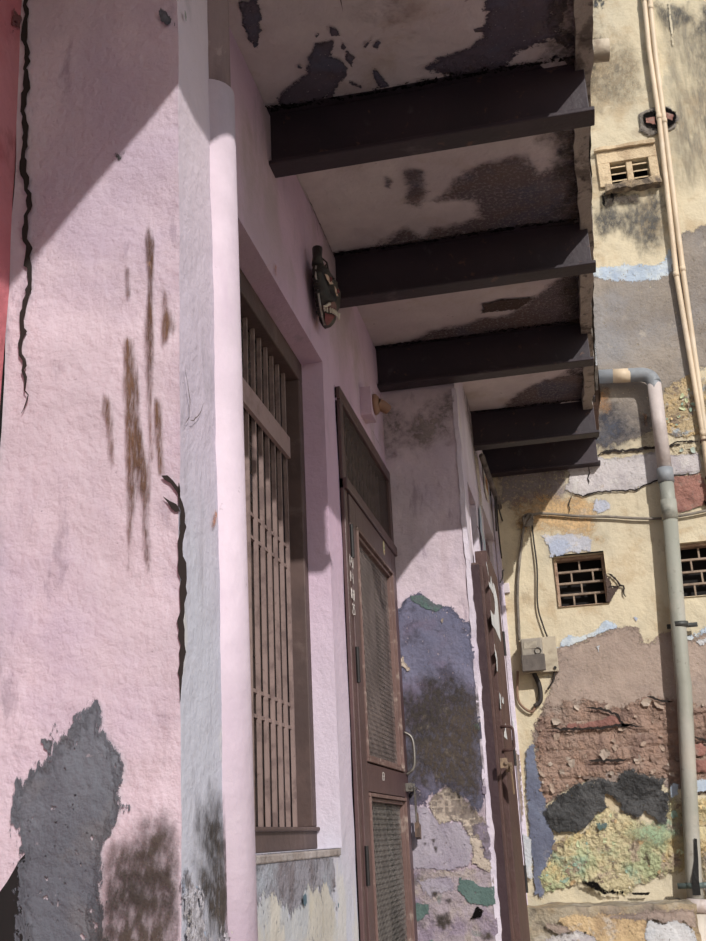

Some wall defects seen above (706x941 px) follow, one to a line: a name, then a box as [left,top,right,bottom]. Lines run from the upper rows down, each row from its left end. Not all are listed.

crack [18,0,32,412]
water stain [595,192,666,247]
rust [104,398,113,452]
rust [124,229,174,533]
peeling [504,224,706,558]
crack [566,440,701,513]
peeling [398,591,498,941]
crack [546,707,643,731]
spalling [523,617,685,898]
water stain [100,825,180,941]
water stain [199,804,227,938]
peeling [545,908,697,941]